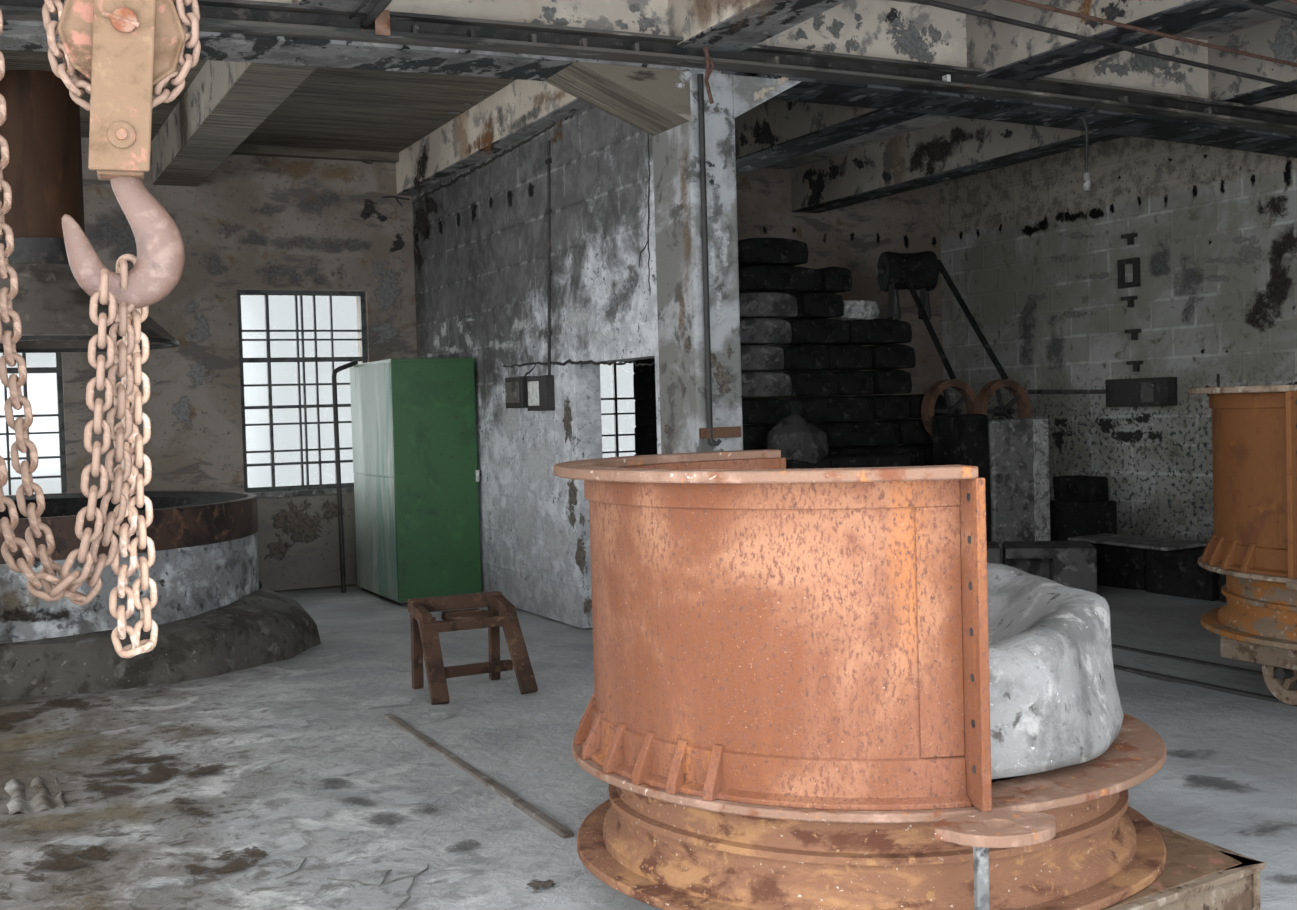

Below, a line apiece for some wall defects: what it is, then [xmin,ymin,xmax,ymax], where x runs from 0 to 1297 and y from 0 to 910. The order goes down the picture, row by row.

peeling [532,0,582,26]
peeling [615,3,666,35]
peeling [765,0,863,53]
peeling [885,8,943,63]
peeling [1085,0,1140,29]
peeling [1084,27,1193,84]
water stain [413,196,442,271]
water stain [606,265,638,324]
water stain [0,696,101,733]
water stain [83,741,230,818]
water stain [23,815,121,881]
crack [275,858,429,910]